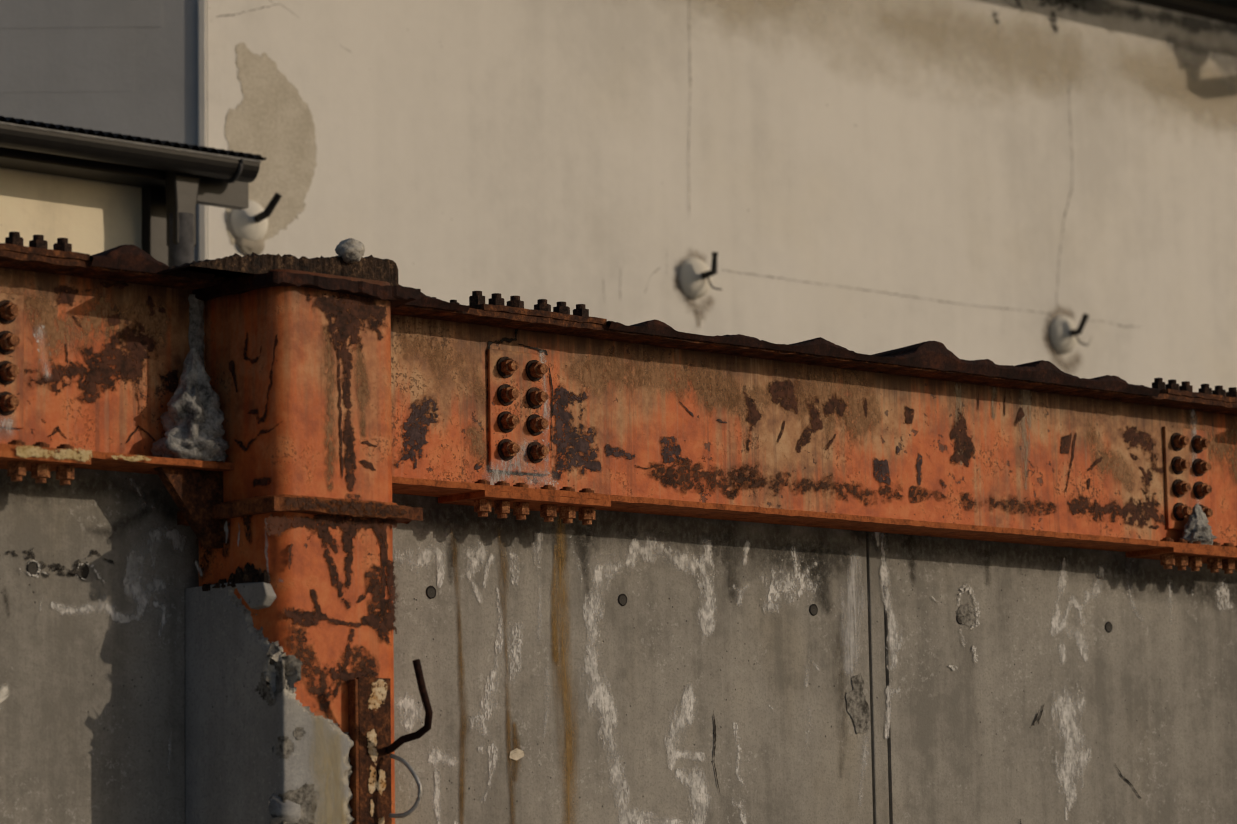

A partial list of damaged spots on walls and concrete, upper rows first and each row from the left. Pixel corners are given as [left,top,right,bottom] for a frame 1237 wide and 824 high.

leakage [1038,0,1237,70]
flaking render [225,43,317,245]
corrosion [24,296,166,403]
corrosion [266,293,407,718]
corrosion [550,380,947,506]
corrosion [961,426,1165,529]
spalling [255,655,302,706]
spalling [276,727,306,759]
spalling [278,783,320,824]
leakage [395,500,859,824]
leakage [852,530,1237,670]
leakage [1052,683,1091,820]